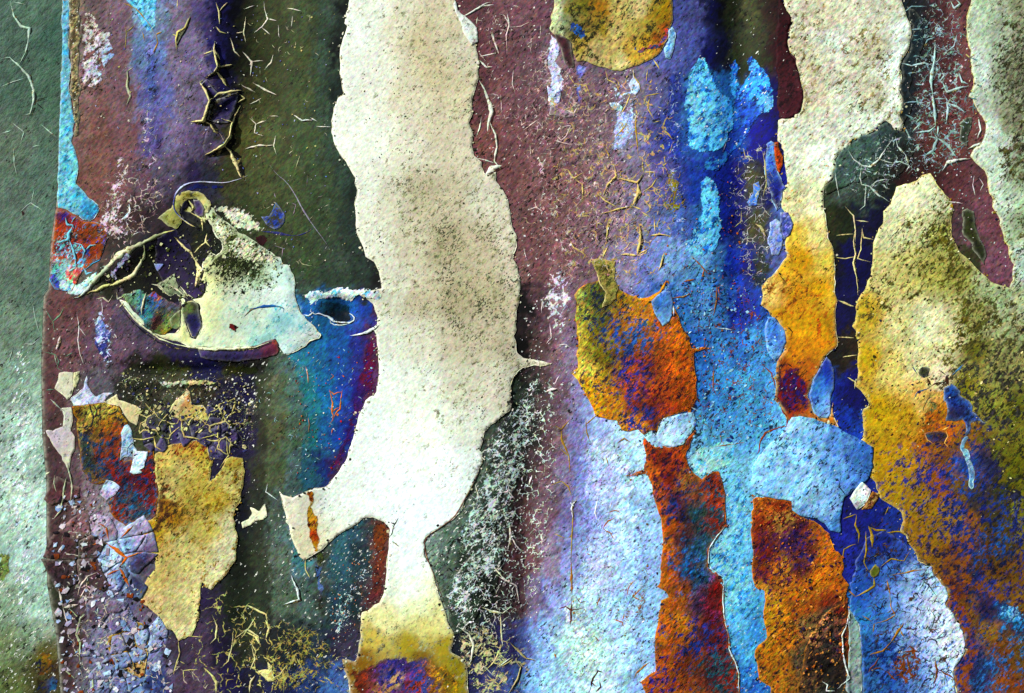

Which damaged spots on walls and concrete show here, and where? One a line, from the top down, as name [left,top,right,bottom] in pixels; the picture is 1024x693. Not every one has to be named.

peeling [111,253,131,280]
peeling [154,229,205,338]
crack [9,0,361,473]
peeling [193,200,204,217]
peeling [262,203,285,229]
peeling [279,0,552,693]
peeling [592,258,618,307]
peeling [651,291,673,326]
peeling [656,0,1024,693]
peeling [41,371,267,693]
crack [45,465,349,693]